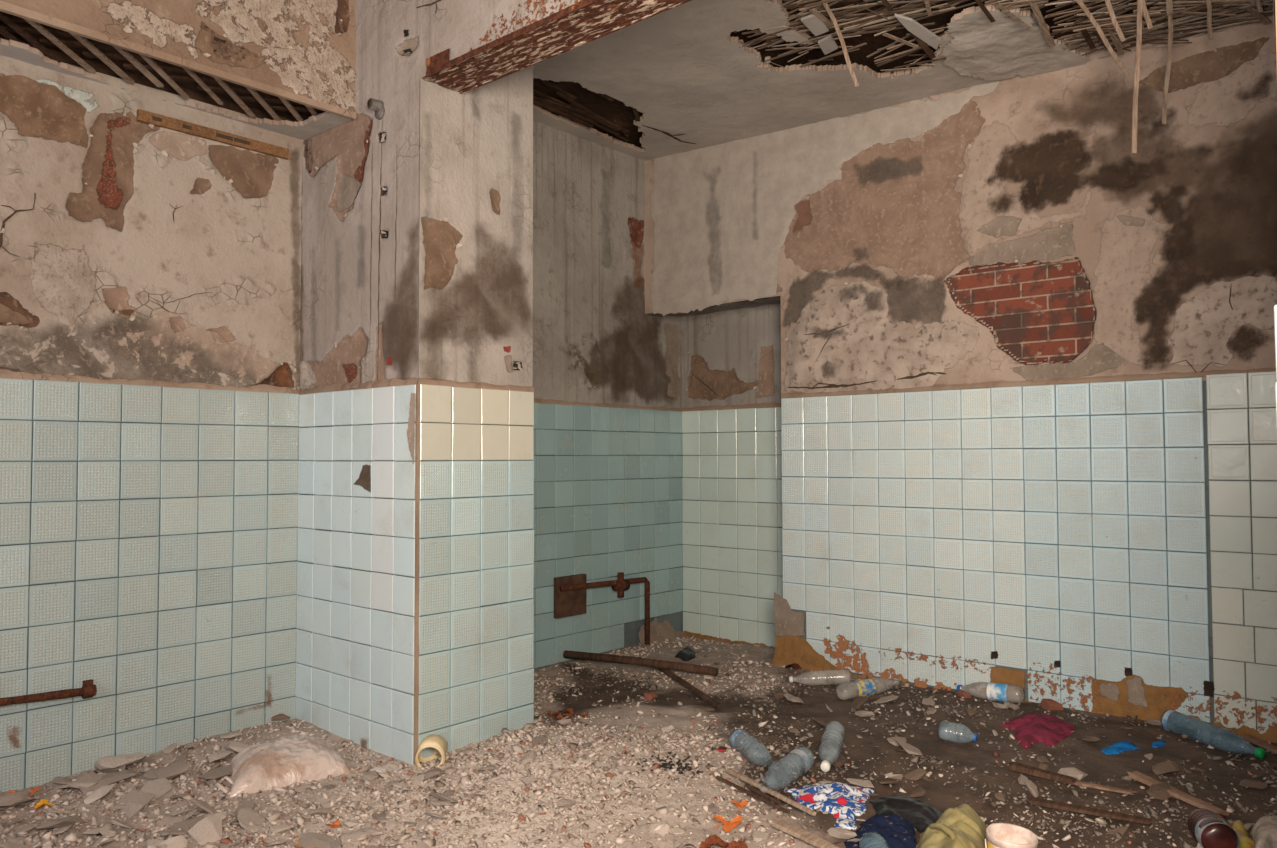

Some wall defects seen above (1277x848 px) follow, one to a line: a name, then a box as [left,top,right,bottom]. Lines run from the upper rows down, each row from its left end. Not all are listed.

rust [470,0,582,51]
flaking render [0,0,386,232]
water stain [1243,76,1271,99]
crack [0,193,36,257]
flaking render [784,99,1075,280]
water stain [988,86,1277,368]
water stain [382,235,530,380]
water stain [569,279,673,401]
spalling [354,465,371,492]
peeling [773,593,1025,703]
rust [1024,662,1102,712]
rust [1159,687,1277,743]